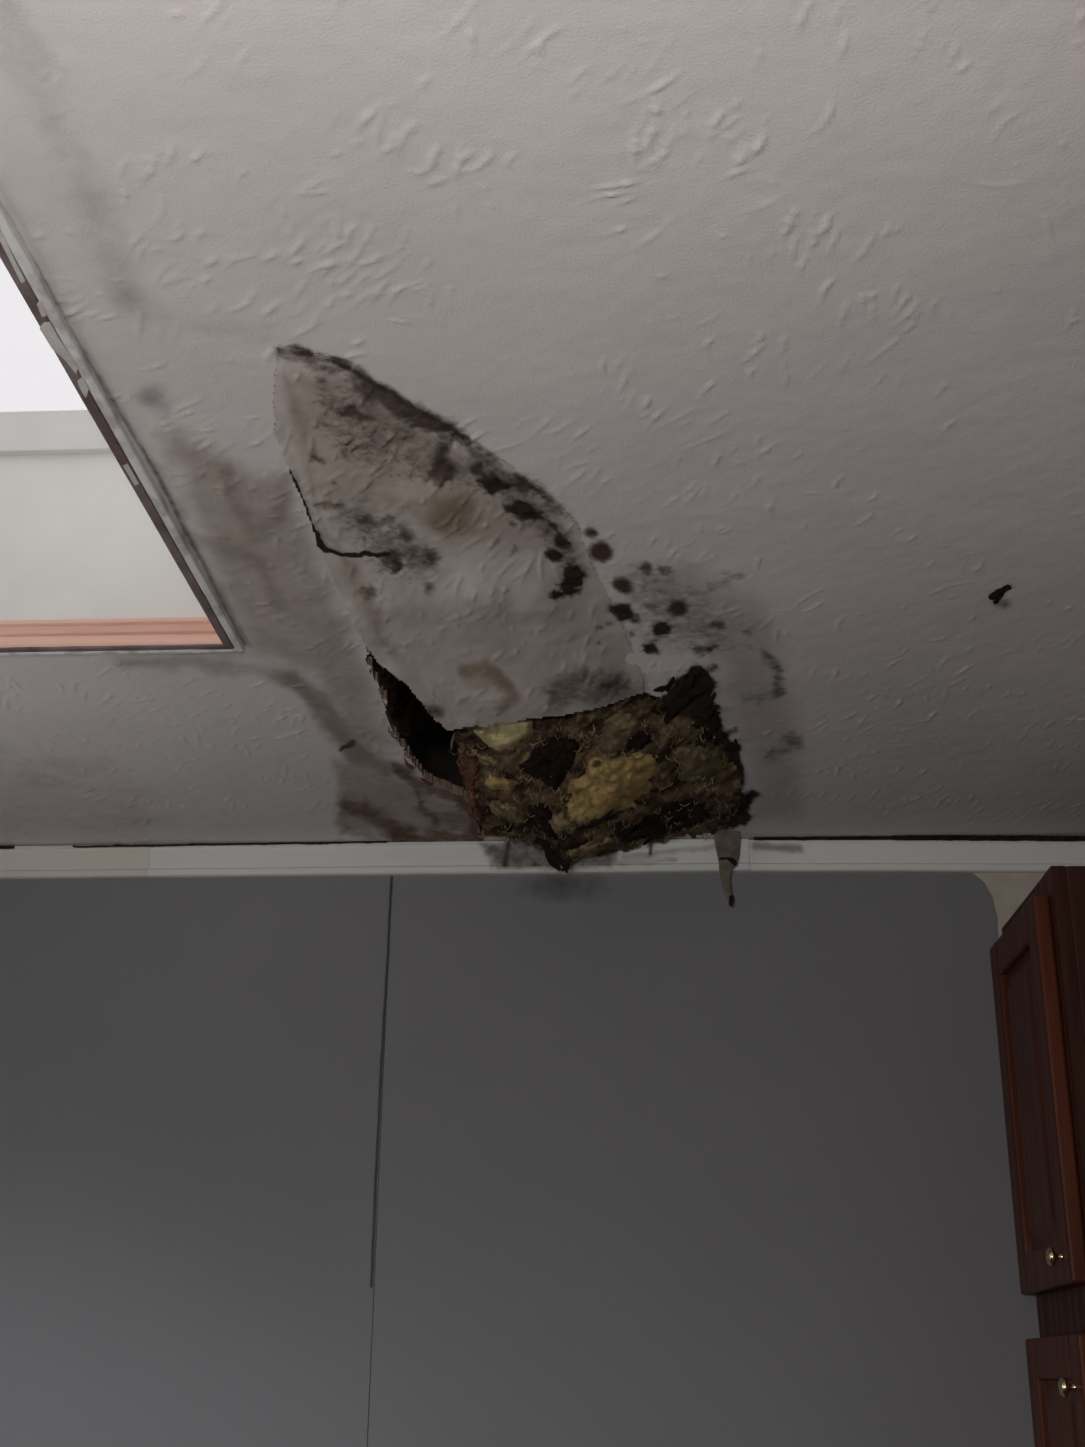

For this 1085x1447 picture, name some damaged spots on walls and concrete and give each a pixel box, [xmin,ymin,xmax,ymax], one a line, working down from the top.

crack [289,469,391,558]
damp [291,345,612,599]
damp [609,564,686,654]
damp [662,622,759,831]